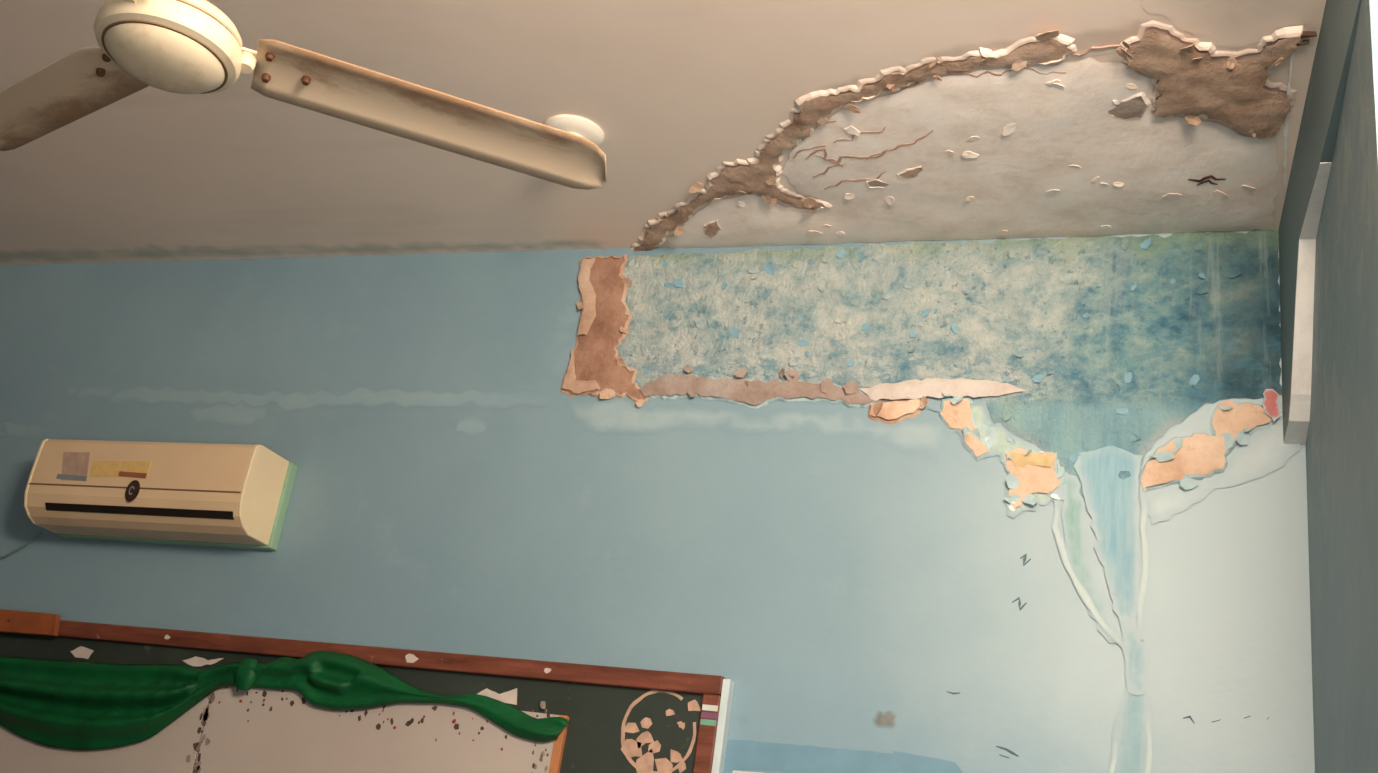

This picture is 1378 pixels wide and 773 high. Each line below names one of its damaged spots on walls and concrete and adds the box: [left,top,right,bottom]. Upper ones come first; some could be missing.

crack [793,120,934,190]
peeling [560,20,1332,525]
crack [900,45,1121,89]
water stain [56,376,1154,773]